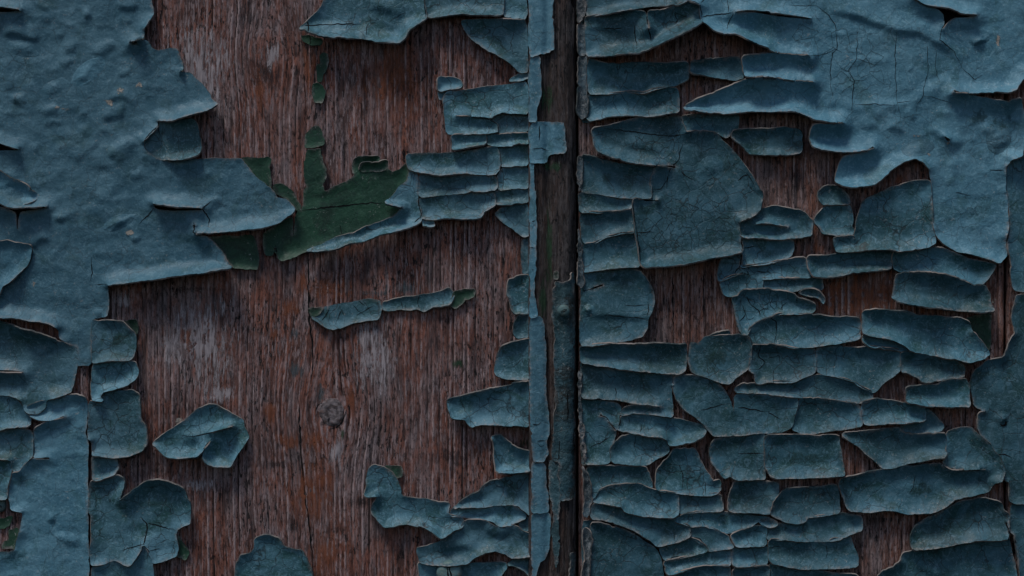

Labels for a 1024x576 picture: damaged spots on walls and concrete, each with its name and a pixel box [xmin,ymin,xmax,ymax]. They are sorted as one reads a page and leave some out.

peeling [0,0,577,576]
crack [675,0,733,27]
peeling [575,0,1024,576]
crack [758,5,980,121]